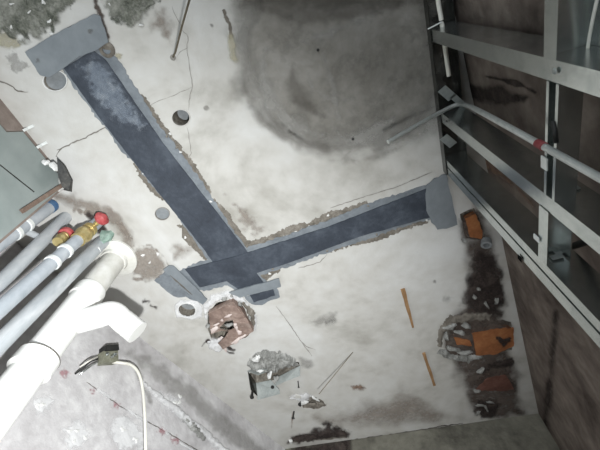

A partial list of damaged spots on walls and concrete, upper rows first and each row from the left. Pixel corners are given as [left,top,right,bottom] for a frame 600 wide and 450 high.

crack [150,8,193,110]
water stain [470,76,536,105]
crack [56,127,105,156]
spalling [460,208,483,243]
spalling [203,291,256,352]
spalling [436,252,514,393]
spalling [250,362,300,383]